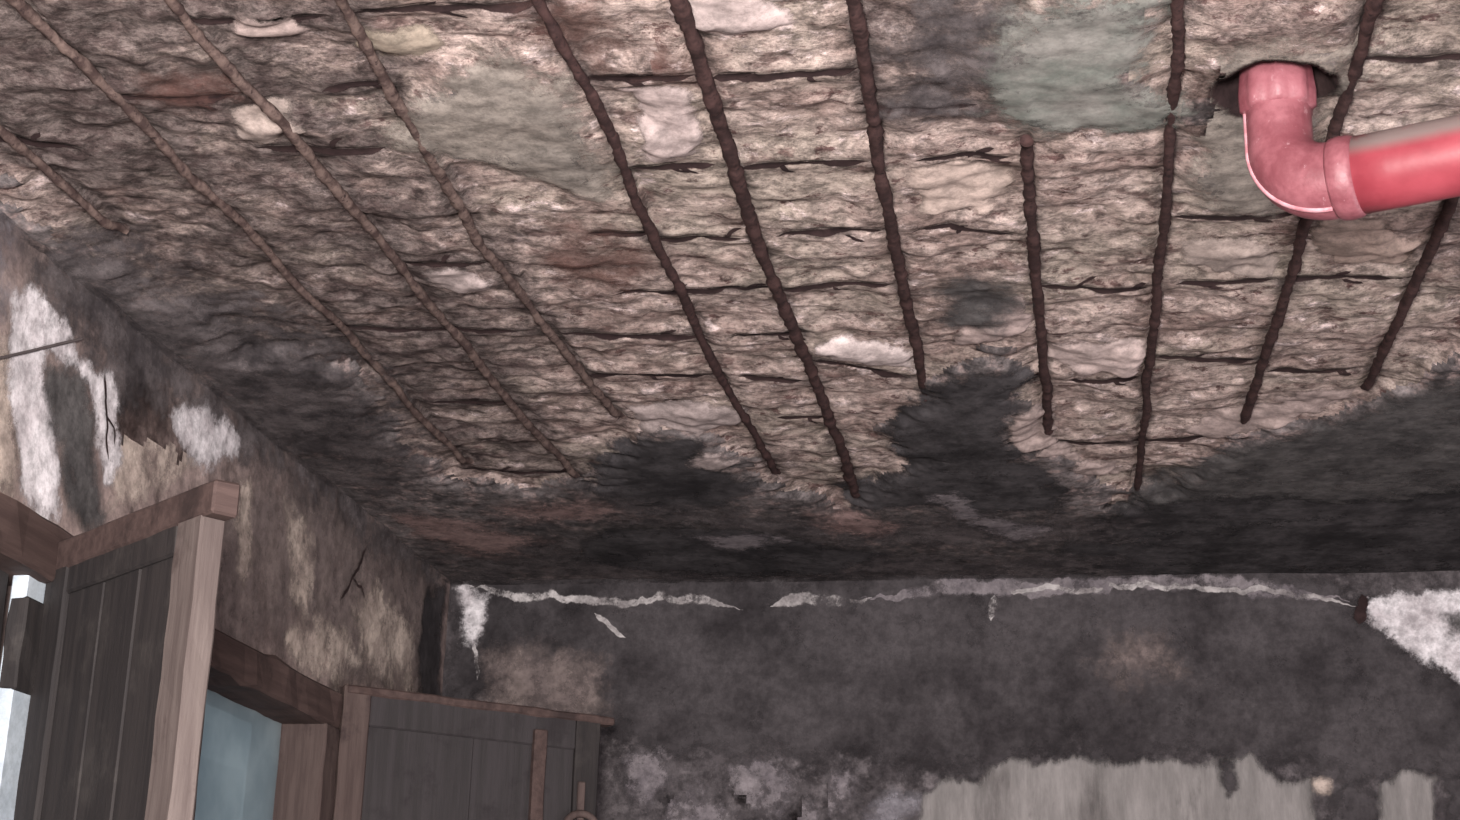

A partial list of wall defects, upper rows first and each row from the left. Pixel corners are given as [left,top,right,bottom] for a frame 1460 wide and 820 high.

rust [531,0,781,475]
spalling [0,0,1460,557]
rust [669,0,860,498]
crack [588,67,977,114]
crack [588,223,1014,243]
rust [846,0,927,402]
rust [1134,0,1186,492]
damp [0,284,195,531]
damp [455,584,600,714]
crack [467,573,1356,638]
peeling [868,754,1332,820]
peeling [1380,770,1434,820]